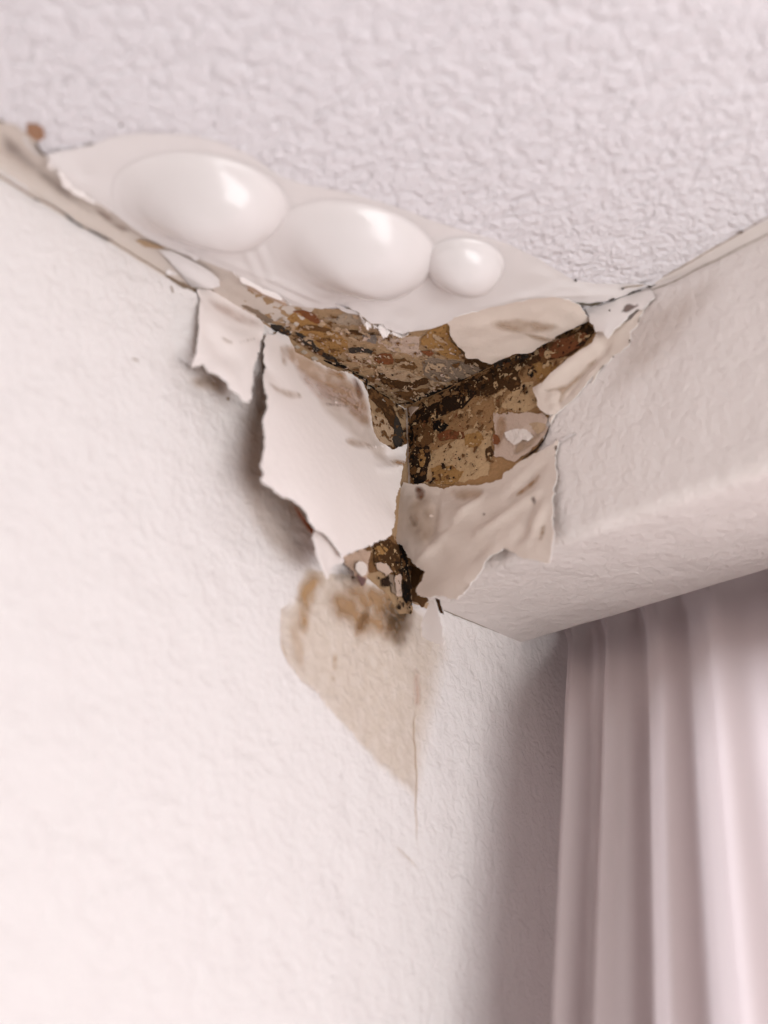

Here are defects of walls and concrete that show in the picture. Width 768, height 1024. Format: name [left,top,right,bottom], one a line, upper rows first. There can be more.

peeling [0,122,655,646]
leakage [241,305,594,486]
leakage [301,579,316,624]
leakage [335,539,424,636]